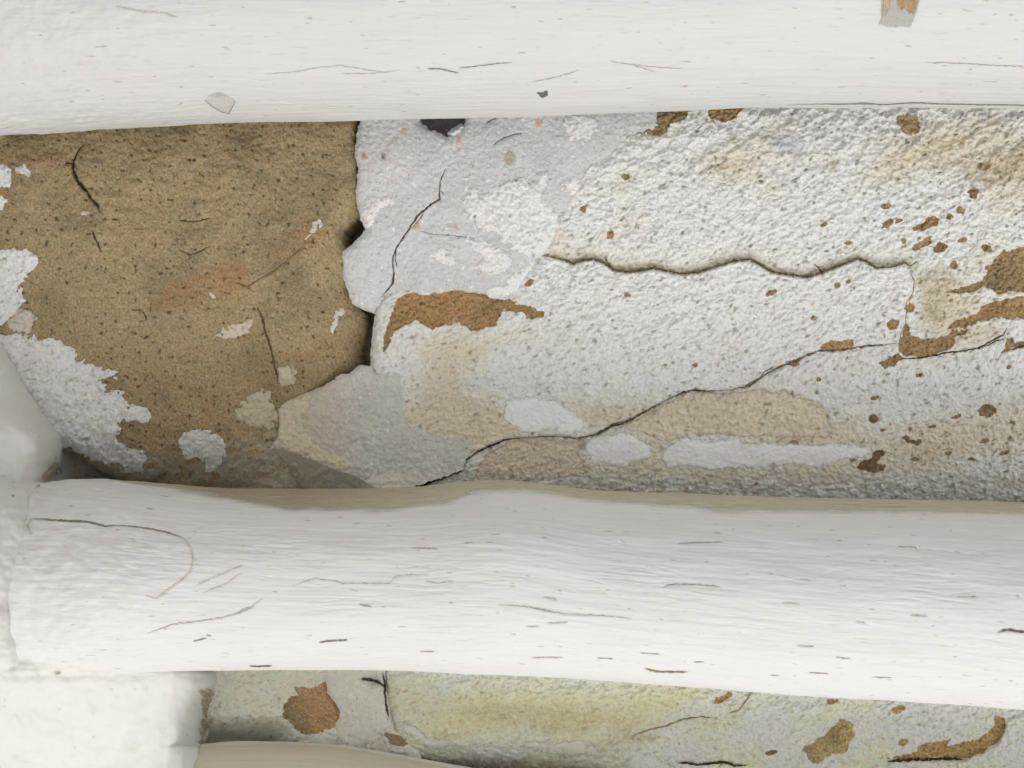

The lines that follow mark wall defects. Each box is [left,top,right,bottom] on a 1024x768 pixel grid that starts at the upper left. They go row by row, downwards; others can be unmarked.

peeling [634,111,688,137]
peeling [708,108,742,123]
crack [65,145,101,251]
crack [384,173,471,294]
peeling [383,290,544,352]
peeling [879,244,1024,369]
crack [414,255,1024,487]
crack [27,518,243,598]
peeling [283,682,340,735]
crack [361,675,389,717]
peeling [802,719,855,764]
peeling [887,715,1006,760]